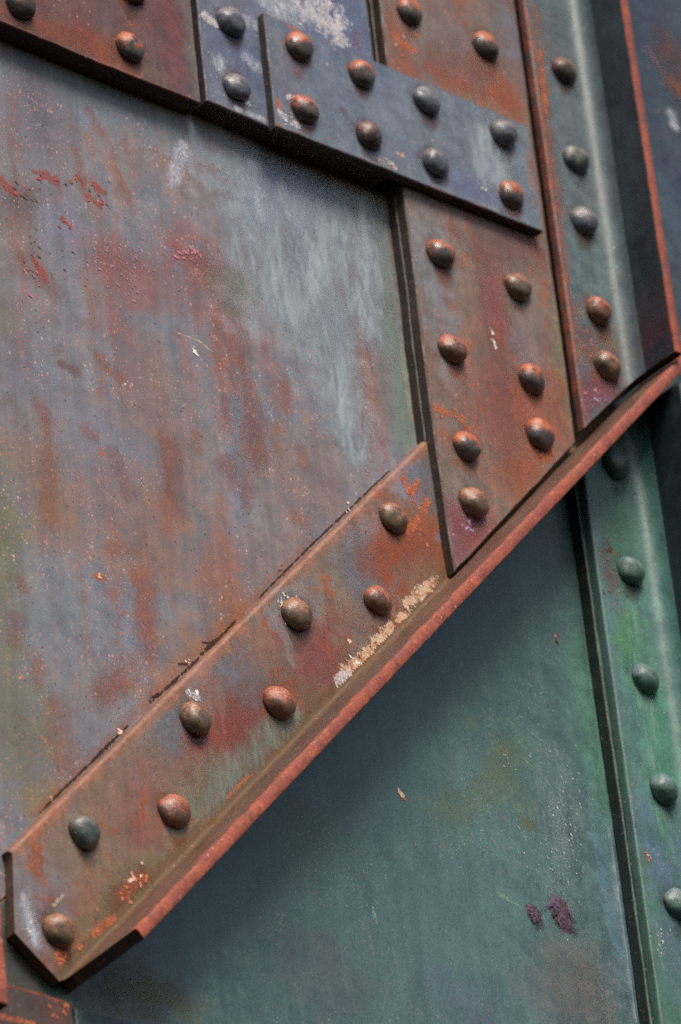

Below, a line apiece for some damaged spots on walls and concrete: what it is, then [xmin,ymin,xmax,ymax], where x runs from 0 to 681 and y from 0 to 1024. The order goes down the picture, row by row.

peeling [0,169,111,222]
peeling [23,228,51,298]
corrosion [400,475,431,547]
peeling [333,575,439,688]